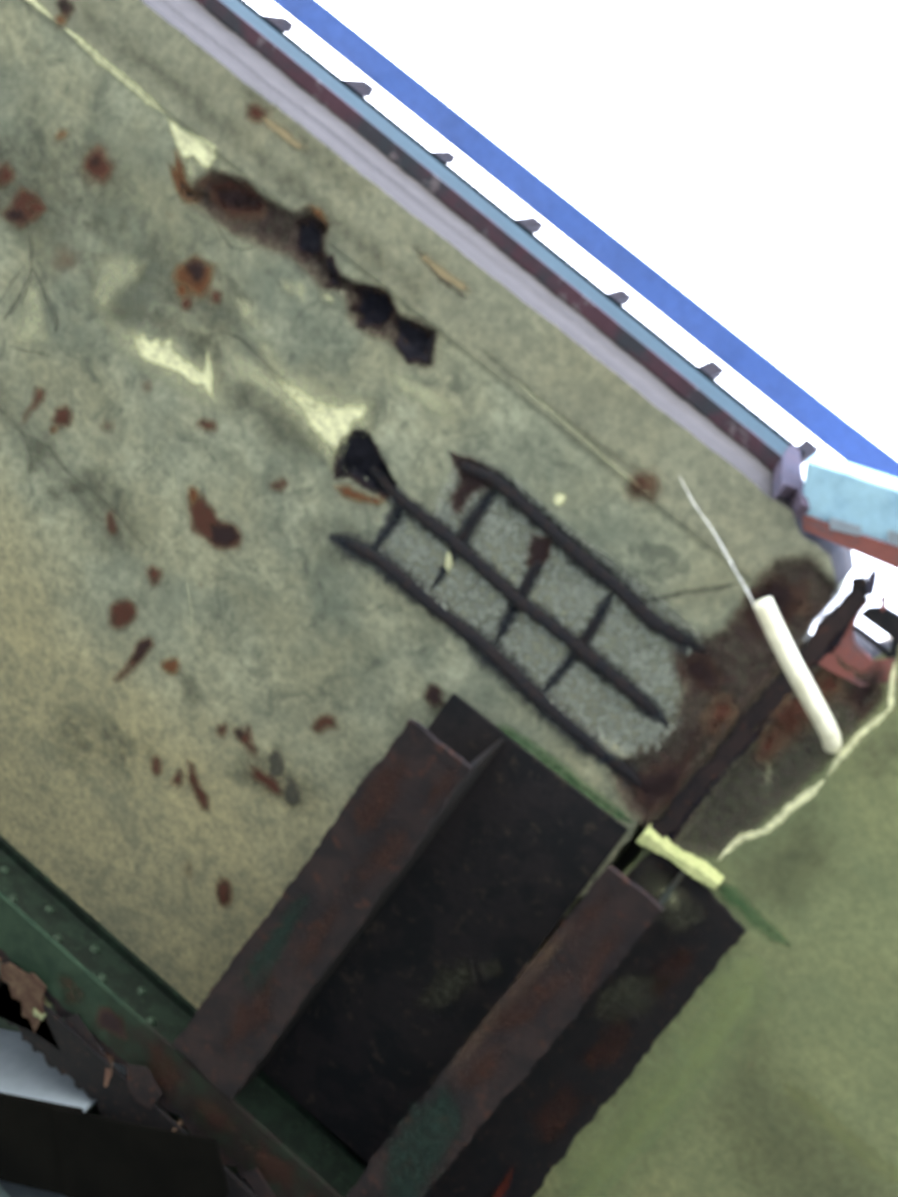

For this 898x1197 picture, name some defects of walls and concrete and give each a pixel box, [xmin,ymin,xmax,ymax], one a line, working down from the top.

corrosion [0,163,47,228]
corrosion [173,257,221,310]
spalling [171,167,436,367]
corrosion [629,476,658,499]
corrosion [187,487,241,549]
corrosion [110,600,136,628]
corrosion [116,638,153,681]
corrosion [151,757,209,809]
corrosion [217,723,282,794]
water stain [718,663,897,861]
corrosion [216,878,231,906]
peeling [33,996,52,1021]